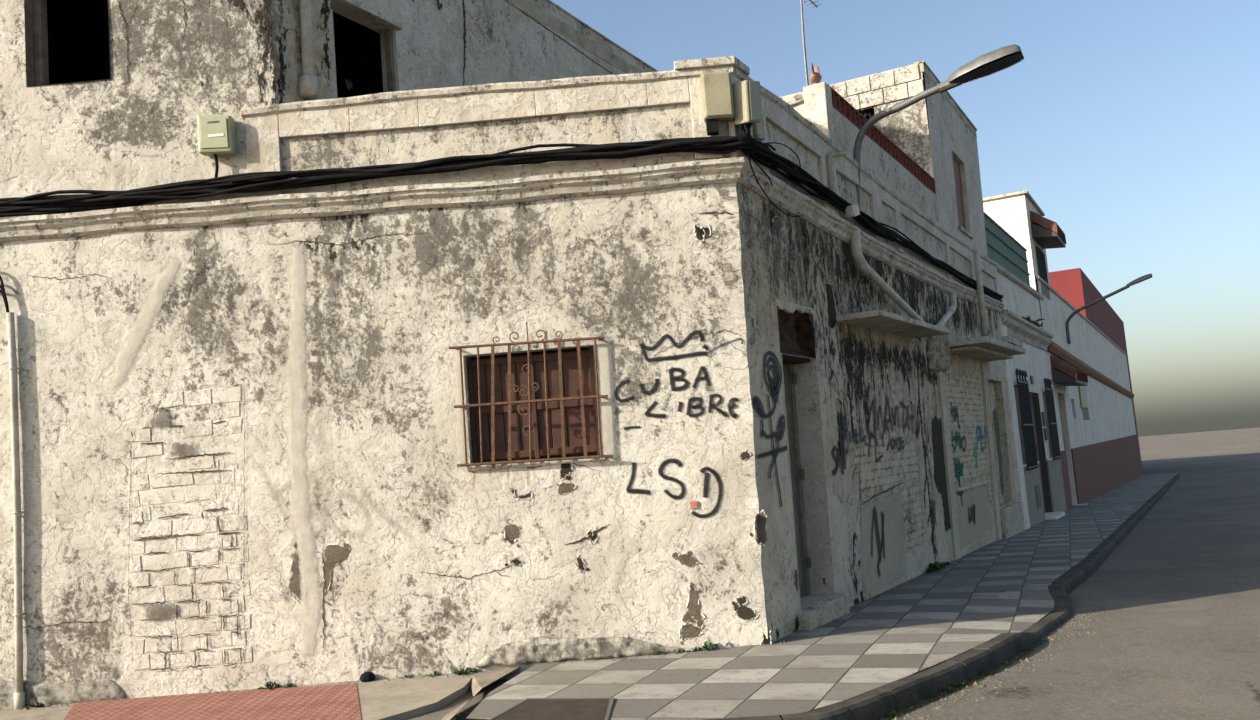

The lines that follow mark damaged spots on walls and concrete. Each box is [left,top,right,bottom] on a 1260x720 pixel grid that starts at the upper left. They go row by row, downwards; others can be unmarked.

leakage [317,0,333,86]
crack [460,0,468,86]
leakage [82,0,287,162]
leakage [810,269,981,462]
spalling [558,463,578,495]
flaking render [126,377,253,670]
spalling [289,543,308,603]
spalling [324,544,351,593]
spalling [672,551,702,567]
leakage [849,532,863,601]
spalling [679,582,706,645]
spalling [732,596,759,621]